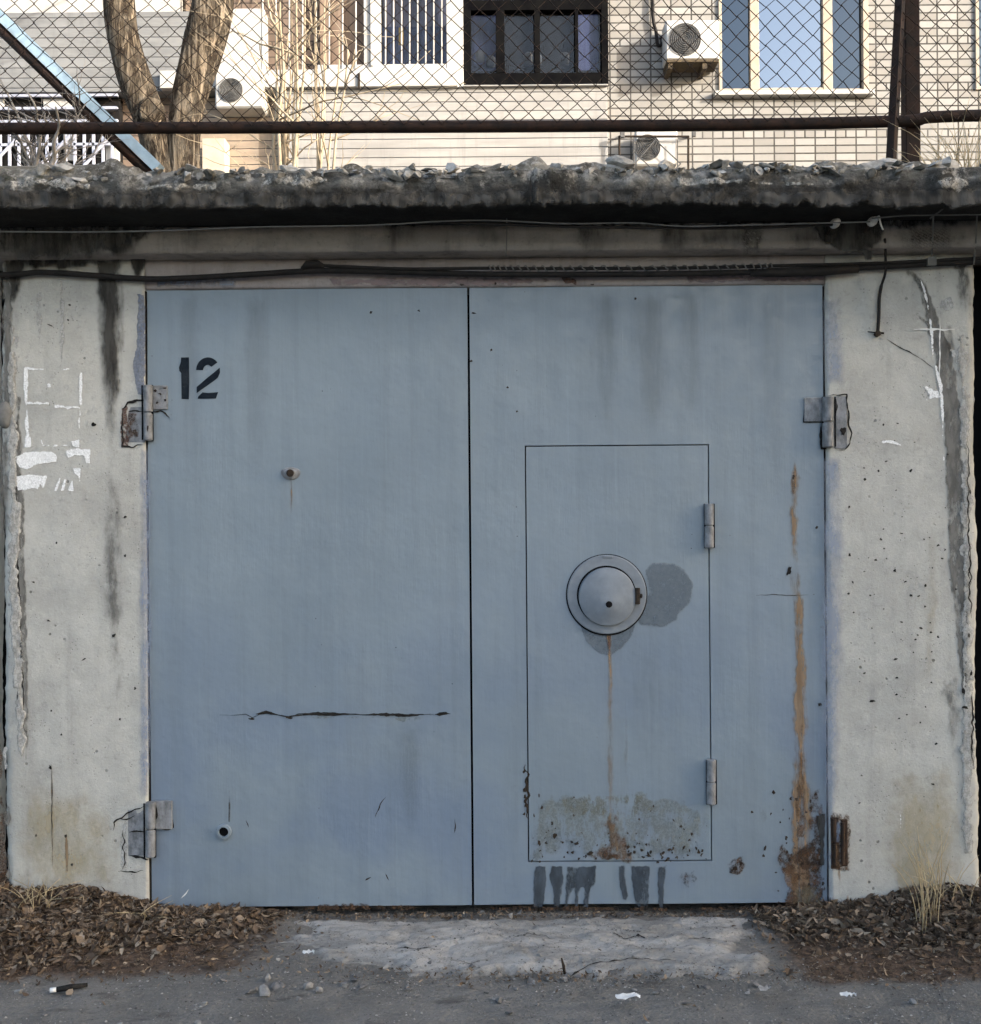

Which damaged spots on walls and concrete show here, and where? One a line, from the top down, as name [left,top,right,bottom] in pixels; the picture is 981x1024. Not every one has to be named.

water stain [0,186,981,260]
water stain [0,226,165,410]
water stain [907,265,969,688]
water stain [109,540,119,618]
crack [240,711,449,720]
corrosion [775,593,851,907]
peeling [531,819,707,863]